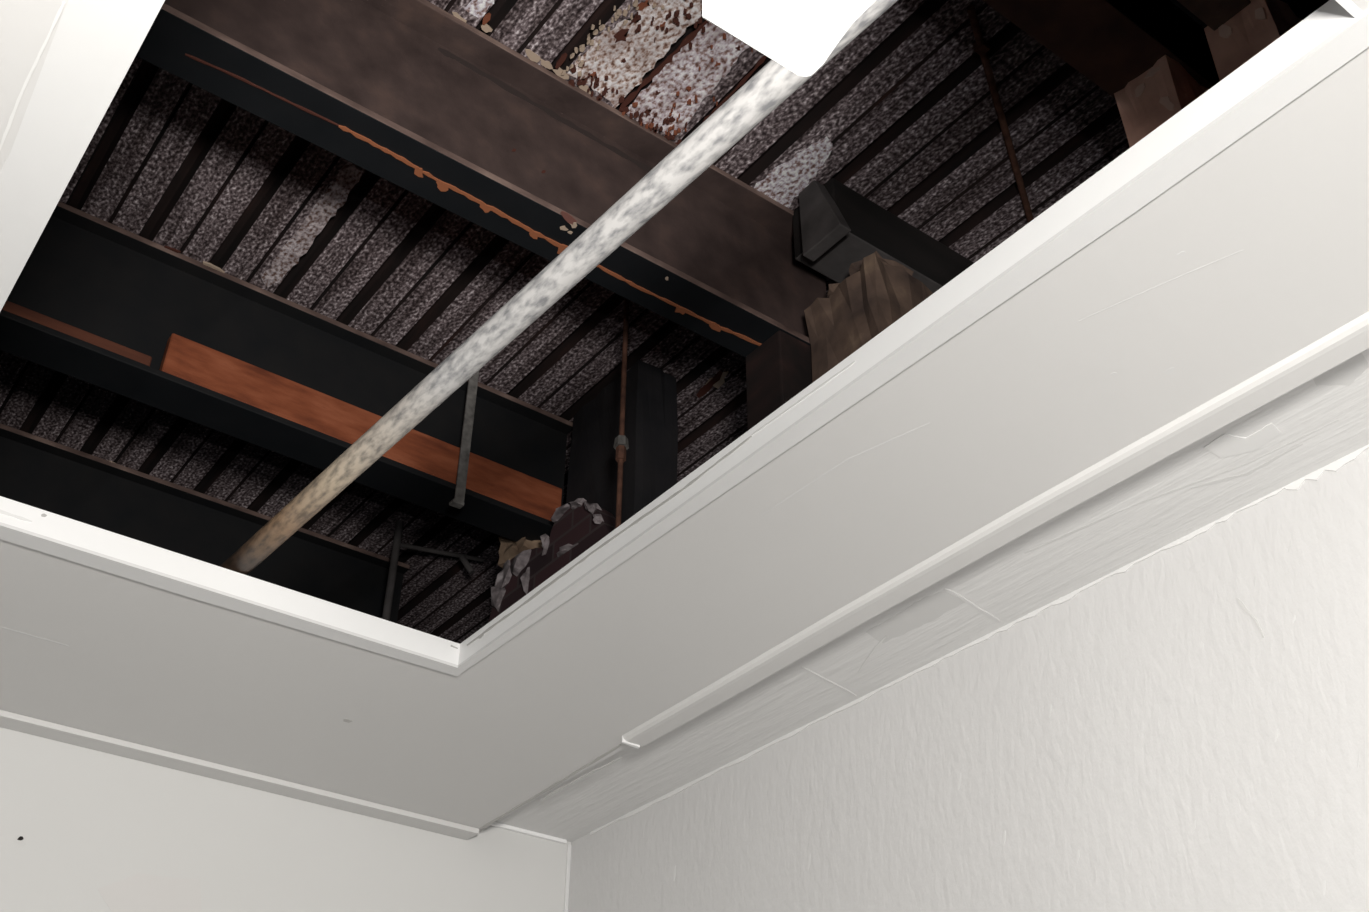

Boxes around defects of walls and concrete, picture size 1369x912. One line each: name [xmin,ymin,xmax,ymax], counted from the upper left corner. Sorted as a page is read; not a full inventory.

peeling [525,0,750,136]
rust [555,0,767,145]
rust [596,265,761,346]
peeling [590,444,1369,836]